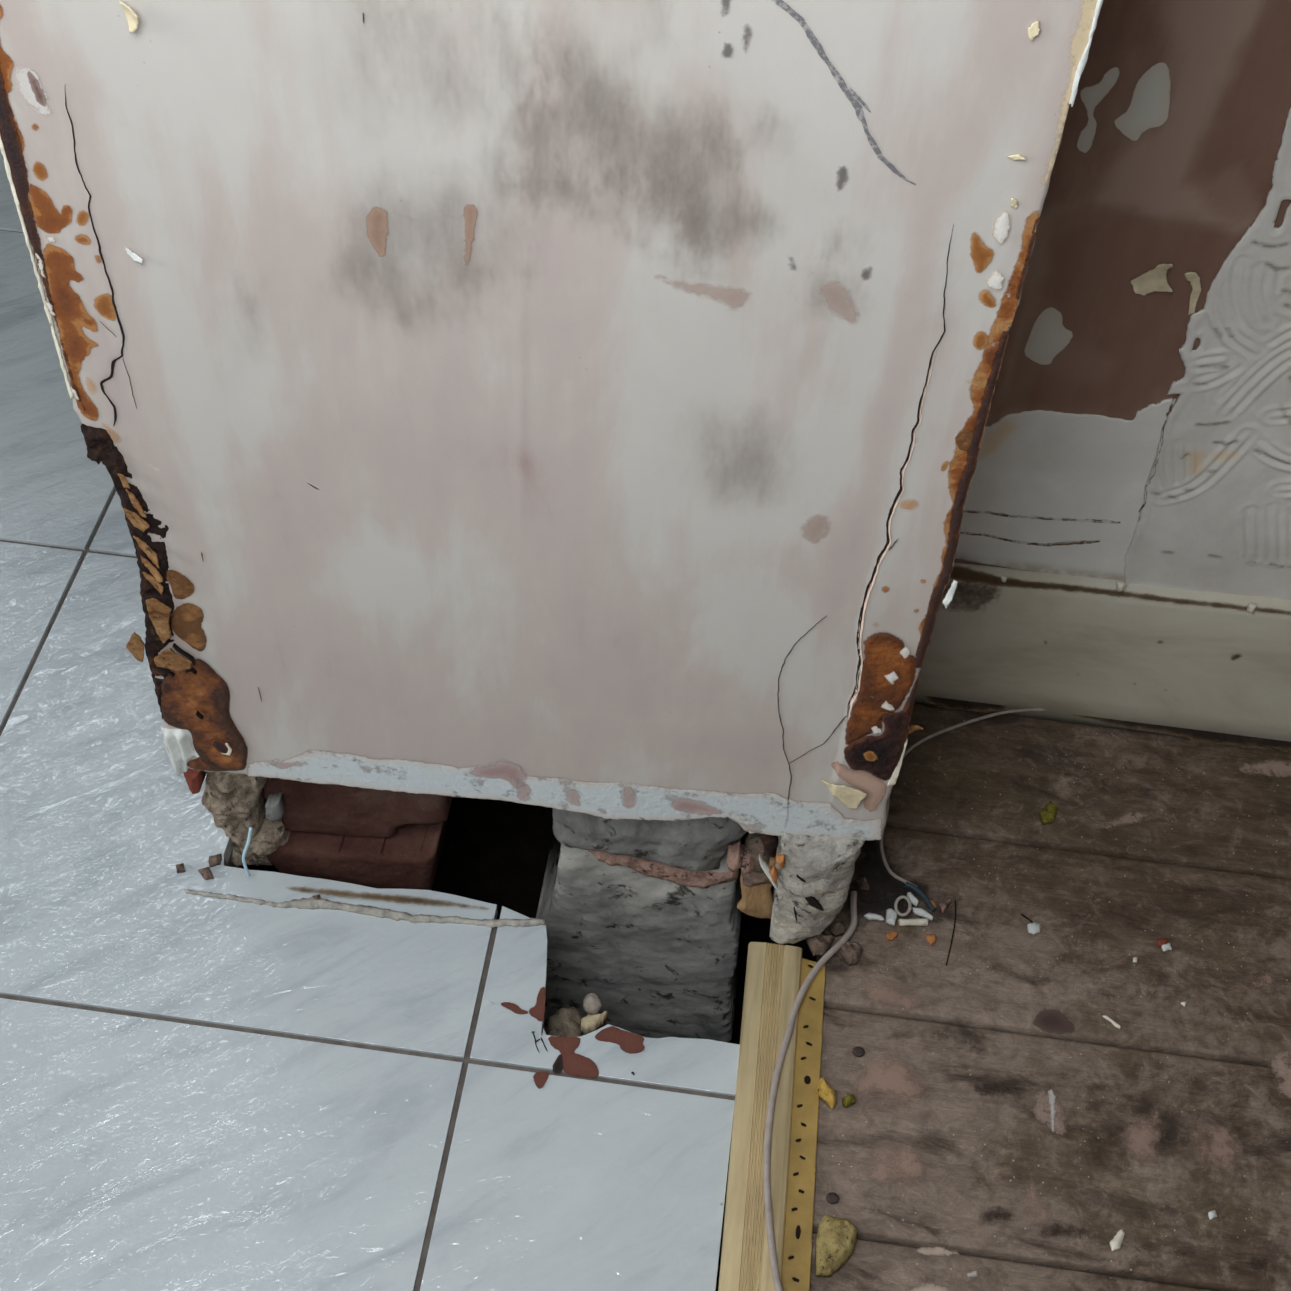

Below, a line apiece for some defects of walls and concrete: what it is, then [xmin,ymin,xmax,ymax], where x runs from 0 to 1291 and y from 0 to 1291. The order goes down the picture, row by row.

rust [0,45,116,421]
crack [65,93,137,426]
spalling [366,207,388,257]
spalling [463,204,477,263]
peeling [1024,307,1073,365]
peeling [1043,0,1120,182]
peeling [1114,62,1171,141]
peeling [1131,264,1202,315]
rust [117,473,248,771]
crack [777,225,954,826]
rust [844,211,1040,781]
spalling [183,738,908,1089]